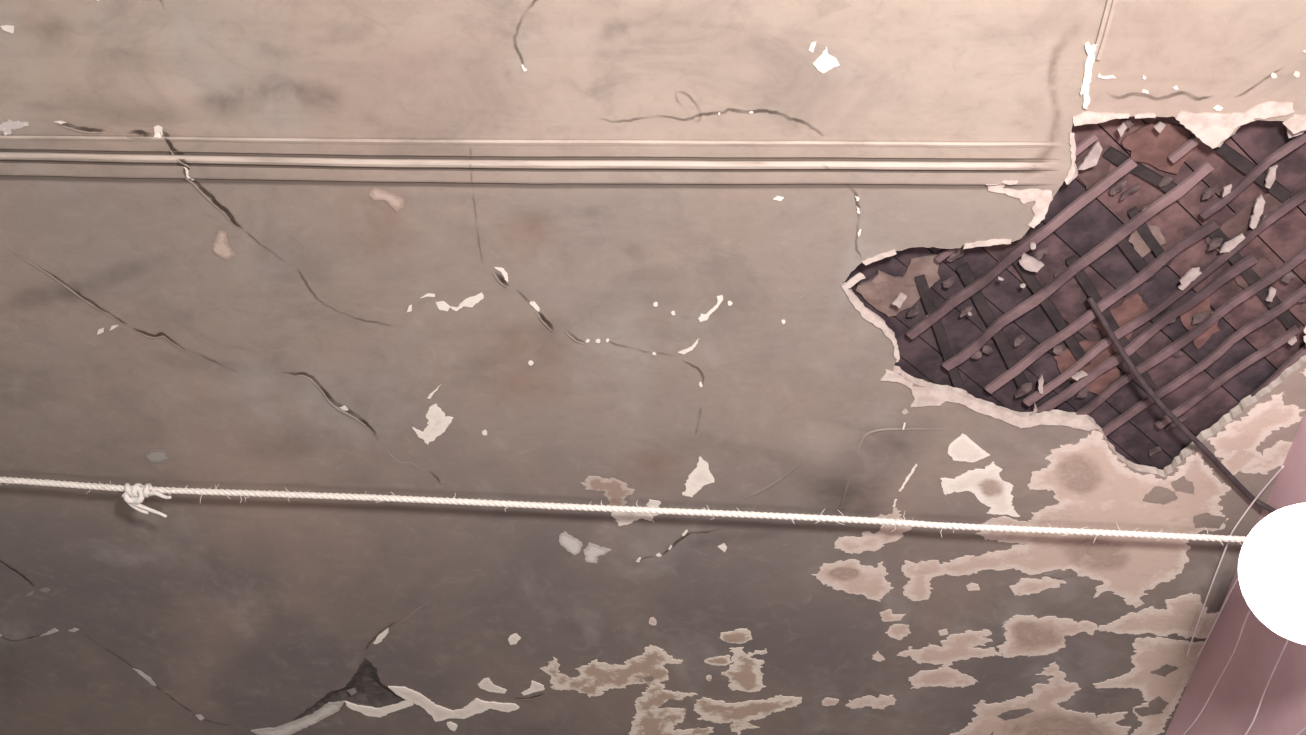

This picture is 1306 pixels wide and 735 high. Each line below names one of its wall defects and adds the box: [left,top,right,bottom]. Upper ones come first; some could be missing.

crack [704,110,801,122]
crack [8,249,187,353]
crack [493,267,609,345]
crack [652,338,700,355]
crack [282,372,378,440]
peeling [412,384,453,445]
spalling [809,41,1306,735]
peeling [682,456,714,497]
peeling [251,628,802,735]